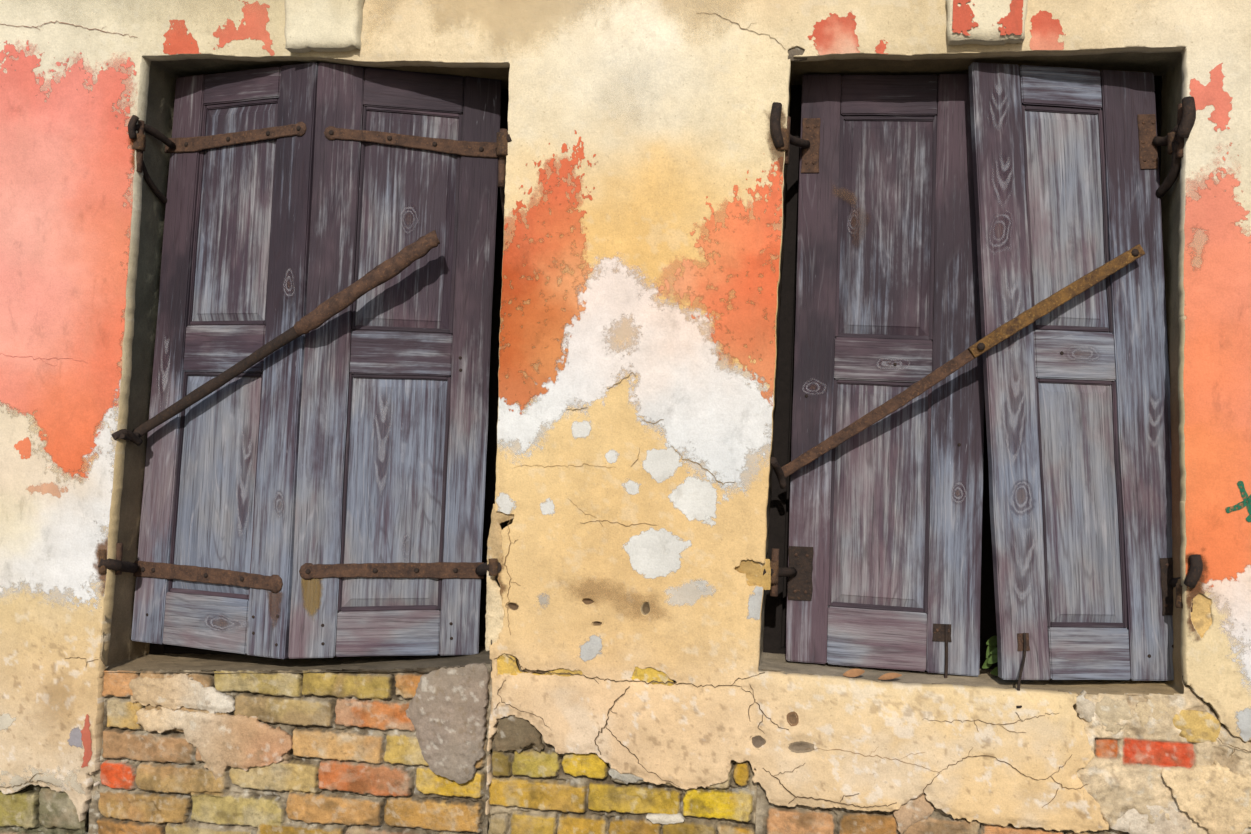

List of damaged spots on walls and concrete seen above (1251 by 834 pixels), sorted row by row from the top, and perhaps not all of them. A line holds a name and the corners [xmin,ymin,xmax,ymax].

peeling [163,19,199,55]
peeling [213,0,275,56]
crack [697,13,785,49]
peeling [788,12,860,62]
peeling [875,40,888,54]
peeling [952,0,1066,50]
peeling [0,40,137,611]
peeling [497,130,783,526]
peeling [1183,63,1251,685]
spalling [0,493,1251,834]
crack [495,520,1088,808]